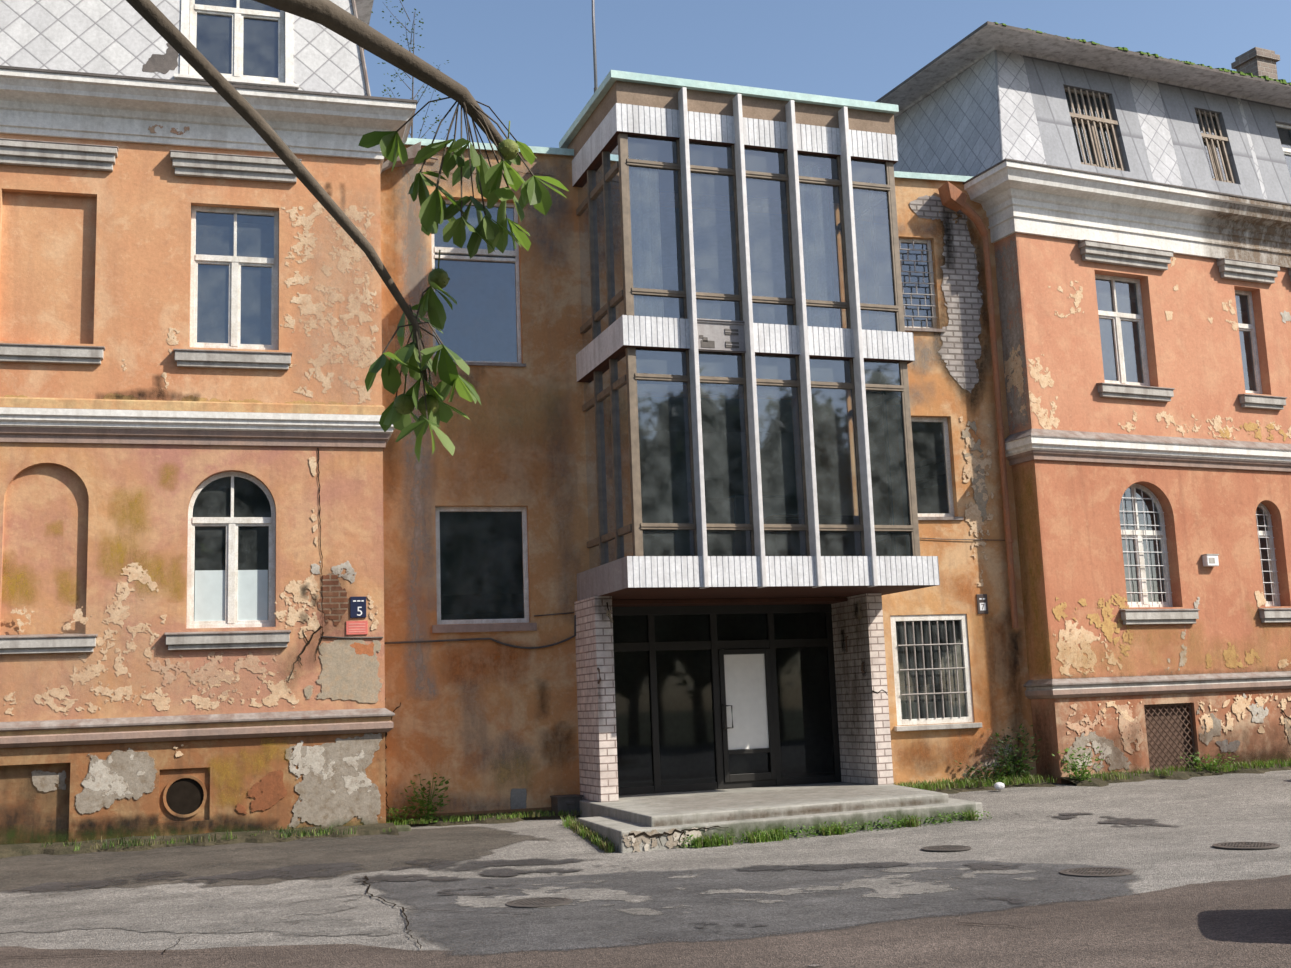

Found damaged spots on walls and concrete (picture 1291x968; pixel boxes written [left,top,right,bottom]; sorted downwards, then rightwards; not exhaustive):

peeling [280,202,379,405]
flaking render [909,195,983,393]
peeling [309,457,317,476]
peeling [959,416,994,587]
peeling [1156,411,1291,441]
crack [288,448,324,681]
peeling [10,607,35,633]
flaking render [34,509,383,716]
peeling [1052,594,1134,678]
peeling [1065,701,1144,754]
peeling [1197,693,1291,753]
peeling [31,770,66,792]